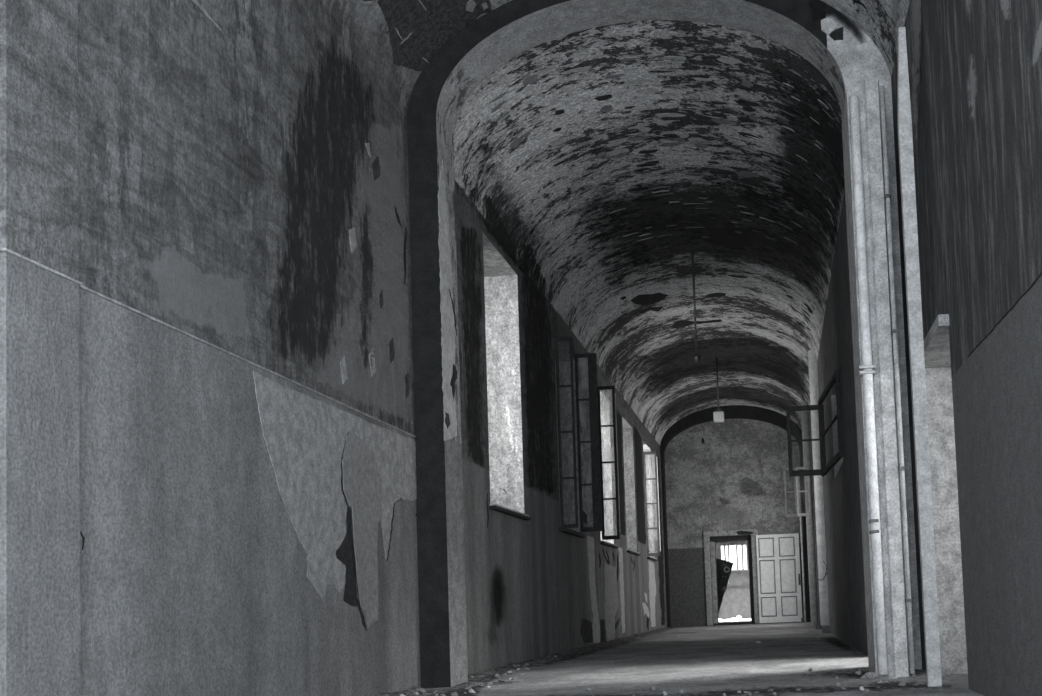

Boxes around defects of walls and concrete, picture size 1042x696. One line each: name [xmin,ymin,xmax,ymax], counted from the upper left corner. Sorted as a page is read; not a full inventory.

peeling [377,0,492,71]
leakage [270,38,375,368]
peeling [253,371,417,631]